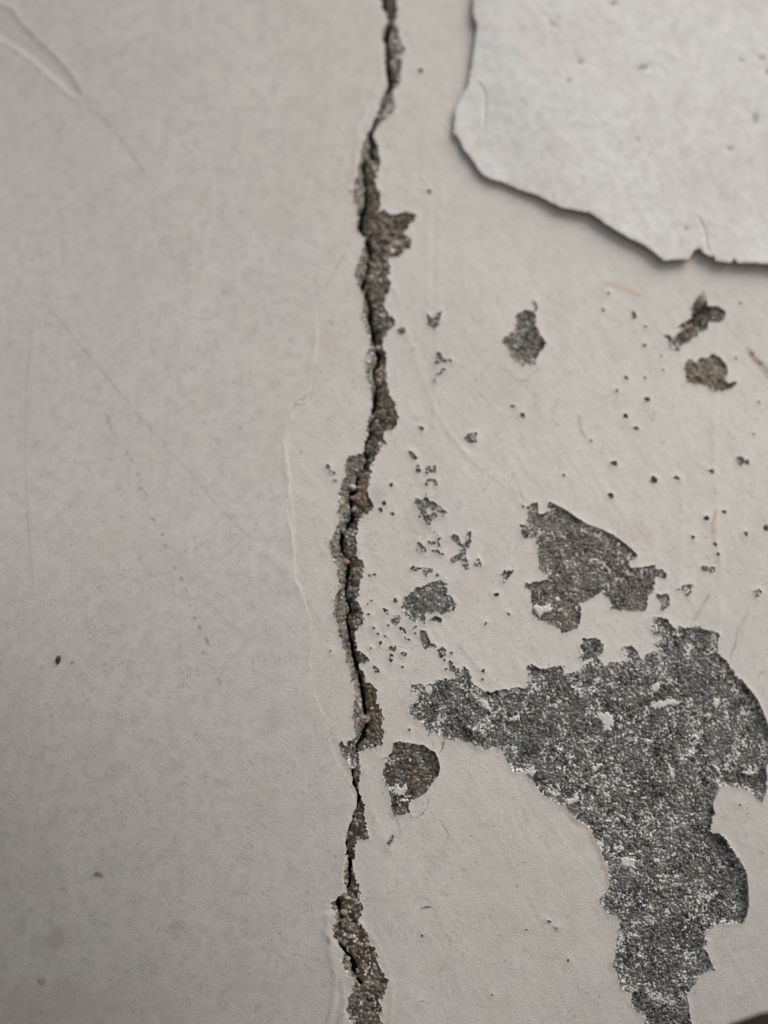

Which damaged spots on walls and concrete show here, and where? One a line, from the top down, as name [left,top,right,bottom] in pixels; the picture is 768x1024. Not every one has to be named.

peeling [453,0,768,265]
spalling [502,300,547,367]
spalling [664,292,736,392]
crack [282,0,417,1024]
peeling [408,451,447,525]
spalling [382,502,768,1024]